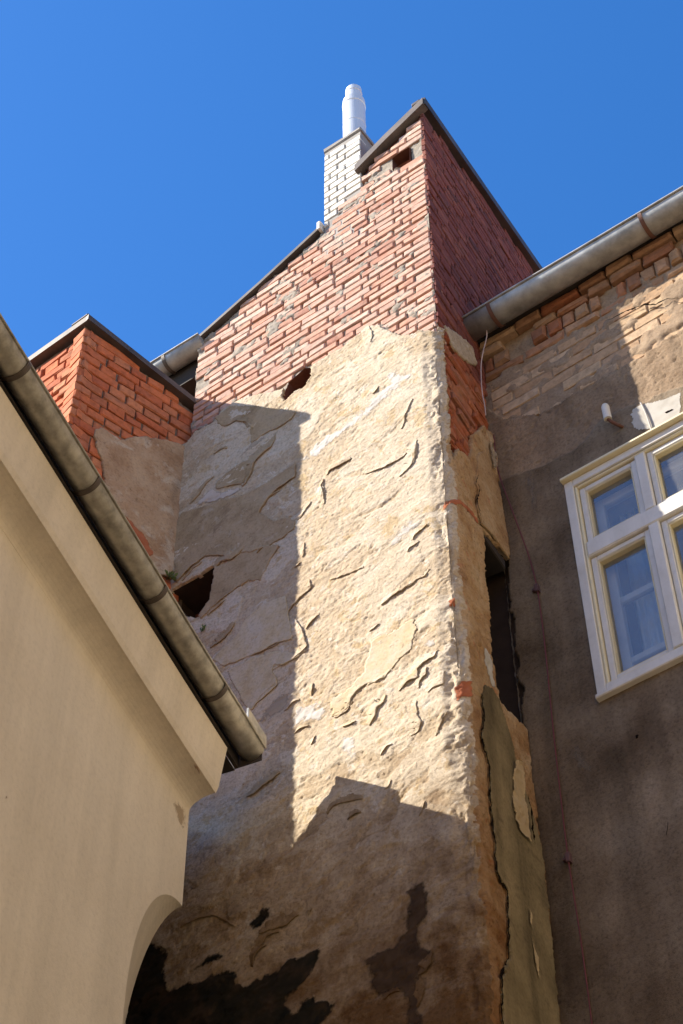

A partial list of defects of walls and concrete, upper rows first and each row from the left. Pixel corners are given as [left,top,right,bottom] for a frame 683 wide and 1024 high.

flaking render [173,368,418,619]
flaking render [381,569,429,605]
flaking render [443,325,510,559]
spalling [630,393,681,430]
flaking render [246,579,561,1024]
water stain [365,882,430,1024]